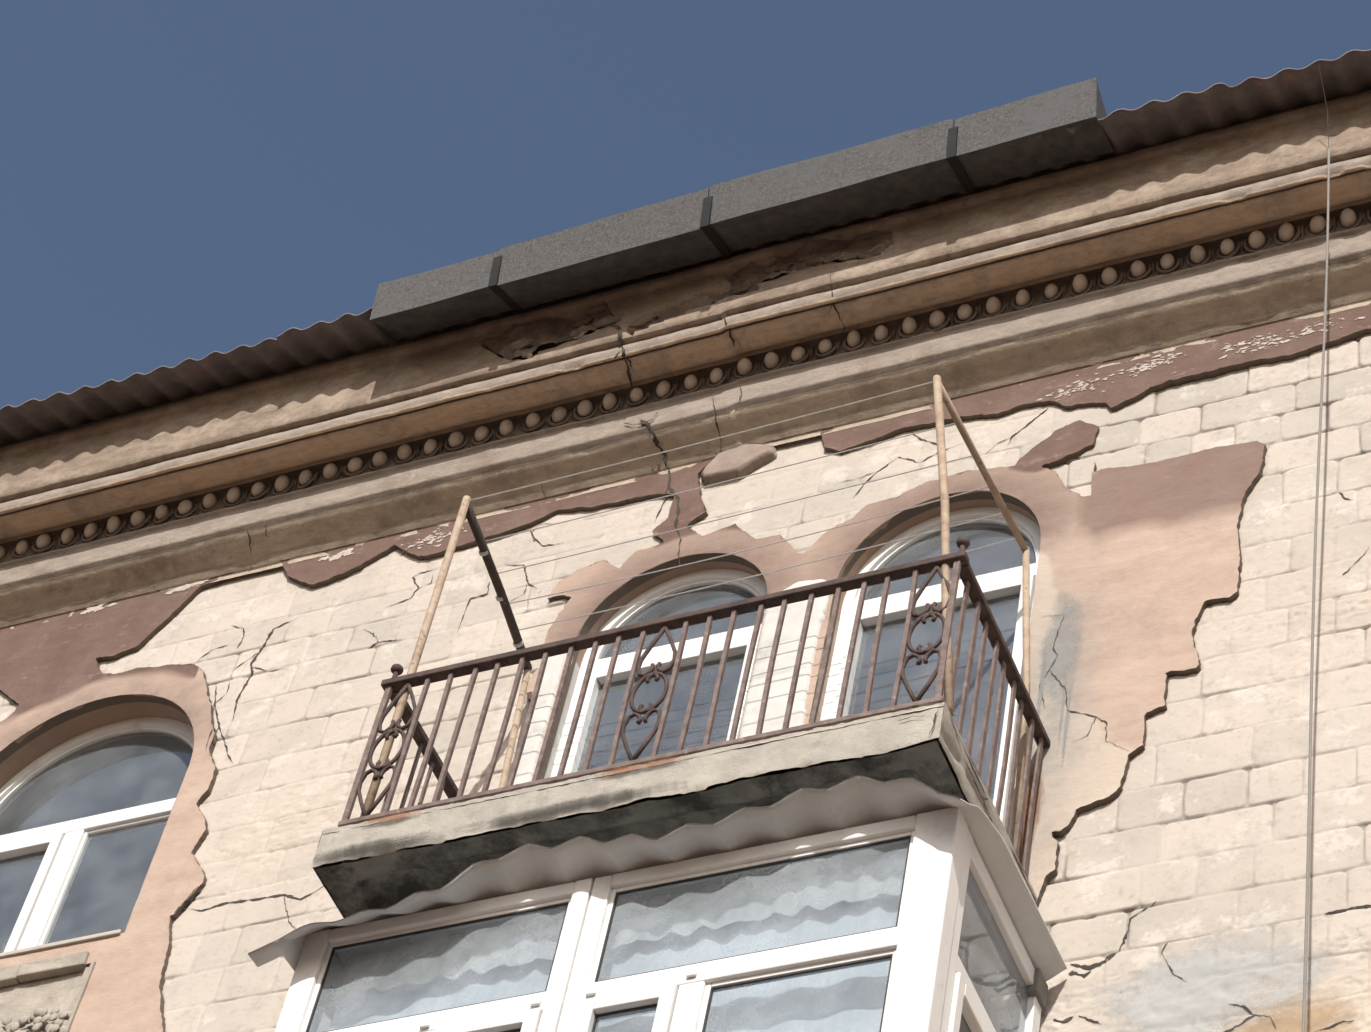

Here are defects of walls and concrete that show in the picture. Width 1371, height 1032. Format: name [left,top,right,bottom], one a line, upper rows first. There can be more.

crack [601,295,635,387]
crack [723,316,741,347]
crack [711,387,742,449]
crack [624,412,682,566]
peeling [0,692,18,722]
crack [200,621,290,760]
peeling [691,315,1371,1032]
crack [1039,615,1127,750]
rust [601,758,675,775]
water stain [472,789,650,826]
water stain [324,835,426,860]
crack [1325,905,1371,914]